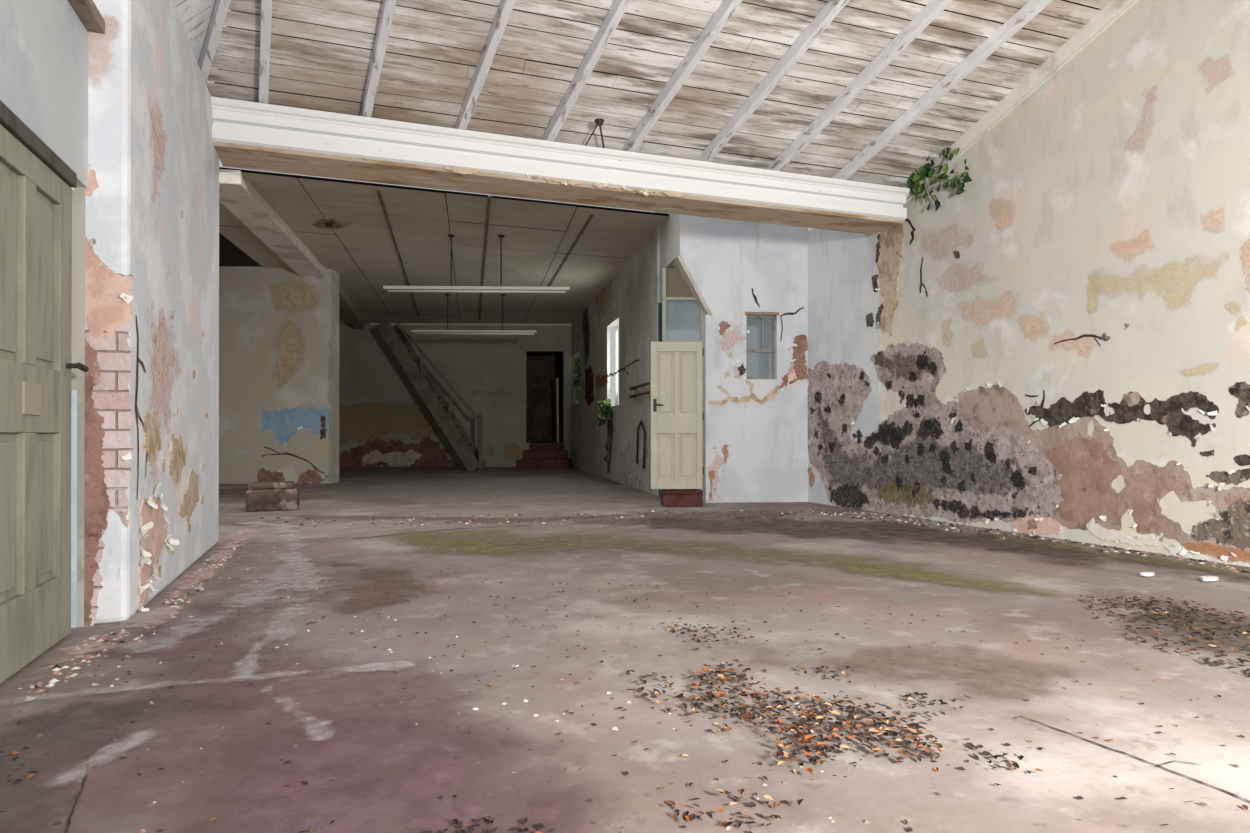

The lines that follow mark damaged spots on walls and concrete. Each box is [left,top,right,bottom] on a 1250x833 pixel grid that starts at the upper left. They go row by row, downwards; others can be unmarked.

peeling [716,321,749,382]
flaking render [780,334,808,391]
spalling [874,351,884,367]
peeling [942,293,1091,355]
flaking render [84,234,204,626]
flaking render [257,402,461,484]
flaking render [950,381,1250,563]